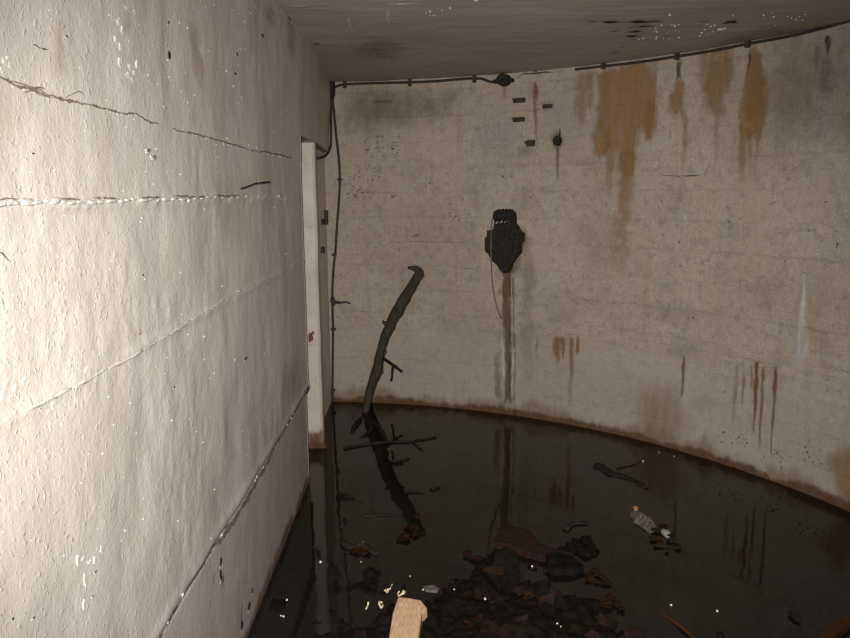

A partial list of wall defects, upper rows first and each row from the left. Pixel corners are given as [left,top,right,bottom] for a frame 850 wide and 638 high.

crack [0,76,292,158]
corrosion [594,63,655,197]
corrosion [740,51,765,153]
corrosion [554,337,579,358]
water stain [334,258,850,512]
corrosion [754,361,764,418]